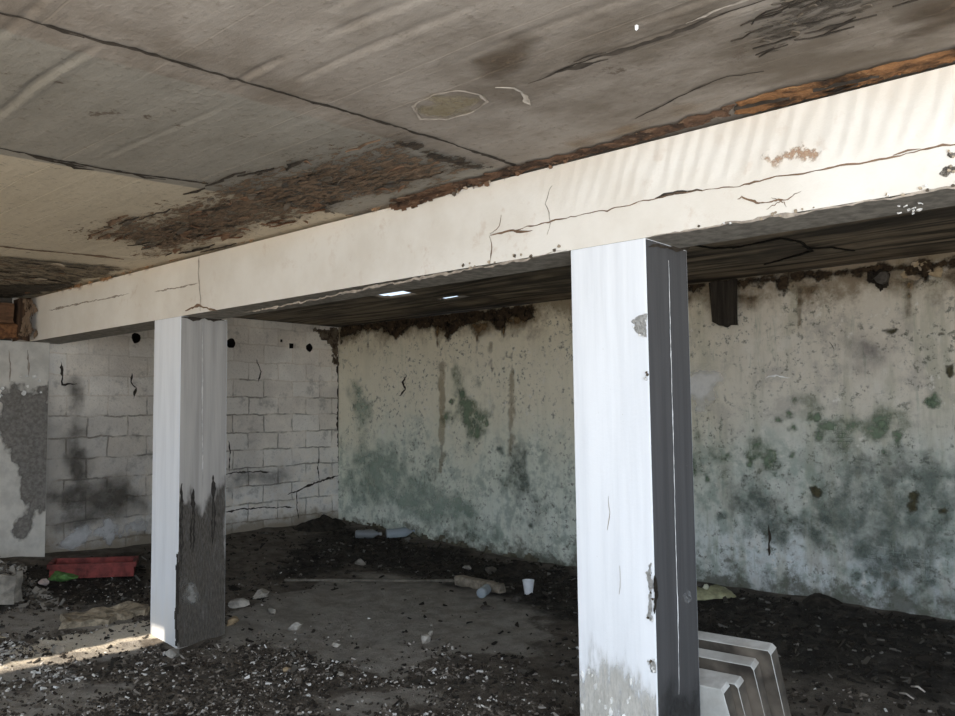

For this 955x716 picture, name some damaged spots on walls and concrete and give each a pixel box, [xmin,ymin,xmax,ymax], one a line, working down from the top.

corrosion [372,49,955,211]
spalling [68,134,492,258]
crack [489,144,955,260]
peeling [0,257,128,298]
flaking render [723,256,955,296]
peeling [0,375,49,539]
mould [443,368,488,439]
crack [649,237,855,668]
leakage [747,440,795,471]
mould [808,410,902,453]
leakage [174,475,226,648]
mould [734,458,955,587]